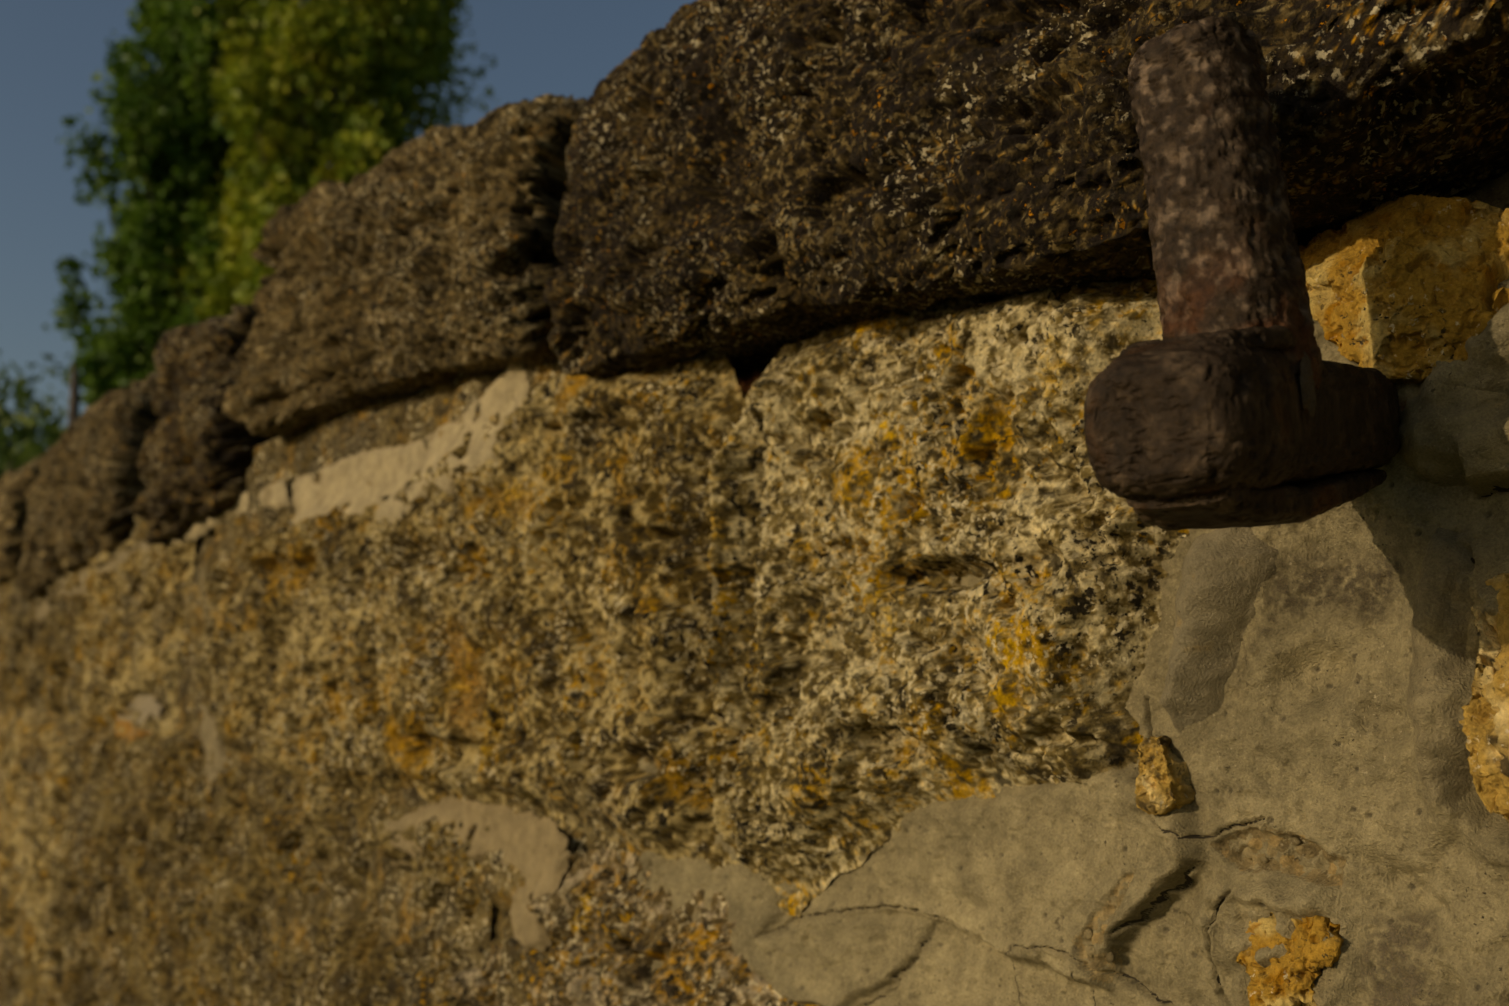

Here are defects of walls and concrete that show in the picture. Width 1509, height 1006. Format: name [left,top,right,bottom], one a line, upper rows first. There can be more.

crack [1111,817,1265,985]
crack [765,905,968,1006]
crack [1005,944,1172,1006]